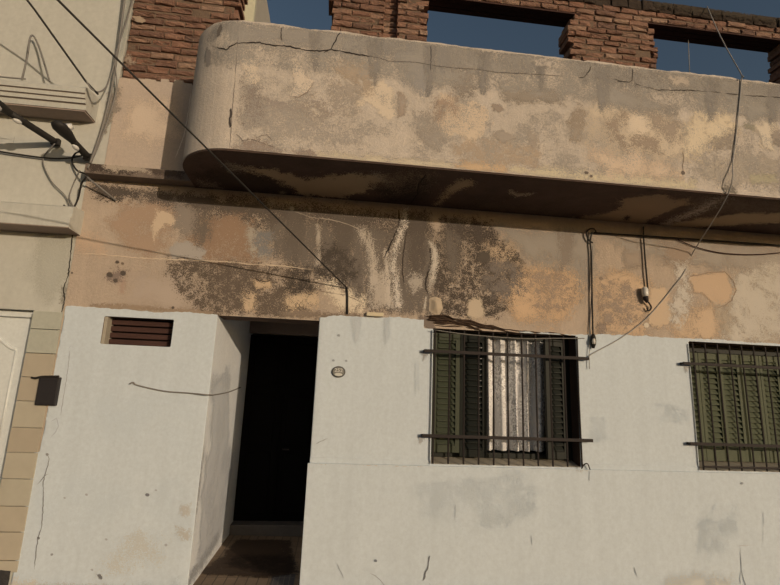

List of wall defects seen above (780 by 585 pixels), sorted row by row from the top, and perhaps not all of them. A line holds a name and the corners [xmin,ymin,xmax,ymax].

peeling [231,58,408,156]
crack [217,28,555,148]
peeling [437,92,516,145]
peeling [680,107,780,163]
crack [61,235,313,312]
peeling [221,159,388,200]
crack [297,210,408,282]
leakage [17,21,780,345]
crack [425,245,444,314]
peeling [479,228,780,344]
peeling [580,194,780,228]
crack [34,456,49,569]